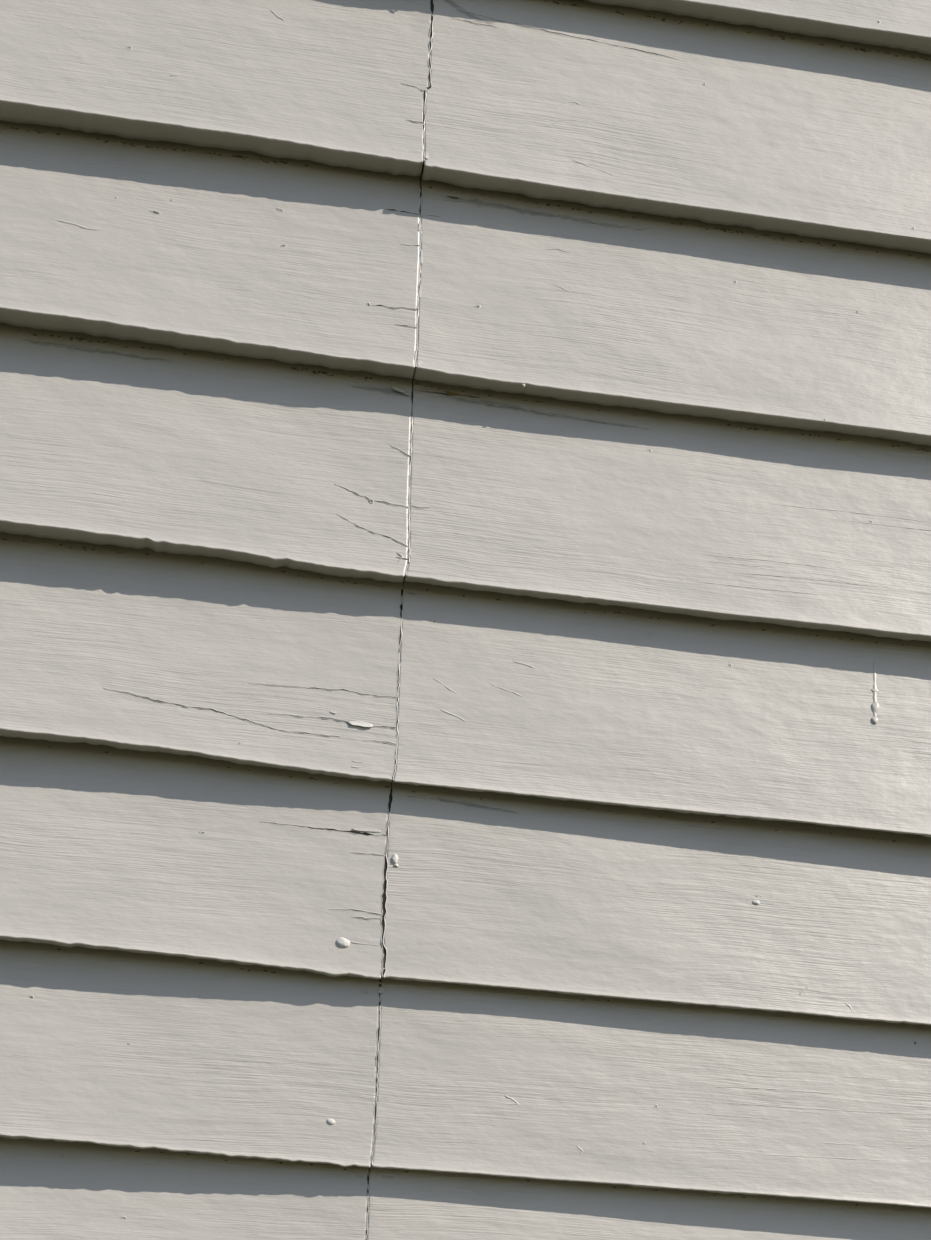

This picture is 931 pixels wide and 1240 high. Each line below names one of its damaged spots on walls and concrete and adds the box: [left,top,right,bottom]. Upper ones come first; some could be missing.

crack [104,0,679,1240]